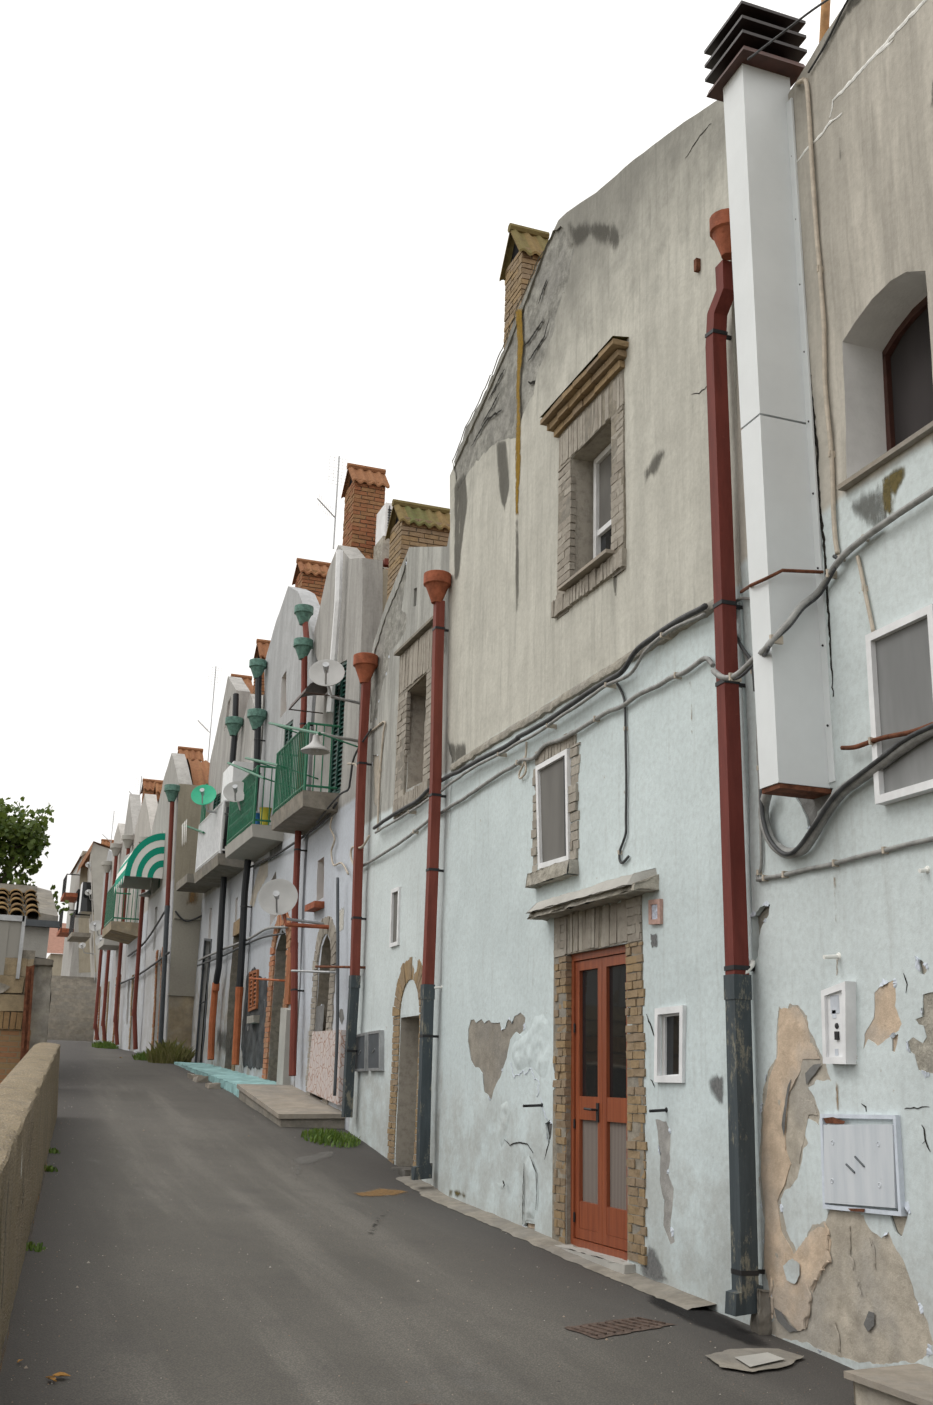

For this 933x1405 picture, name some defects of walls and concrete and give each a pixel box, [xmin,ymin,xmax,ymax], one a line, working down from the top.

peeling [915,956,929,974]
peeling [468,1013,525,1101]
peeling [864,978,933,1078]
peeling [759,1004,933,1365]